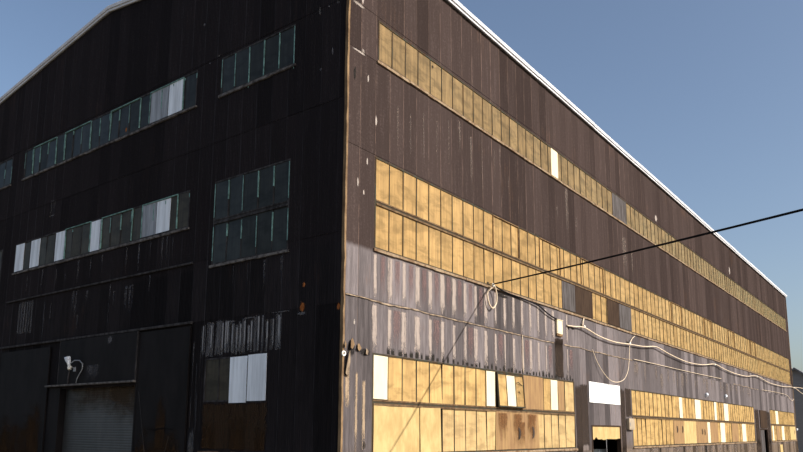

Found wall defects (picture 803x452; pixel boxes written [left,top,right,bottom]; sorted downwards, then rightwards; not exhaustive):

peeling [202,310,290,356]
rust [499,413,536,439]